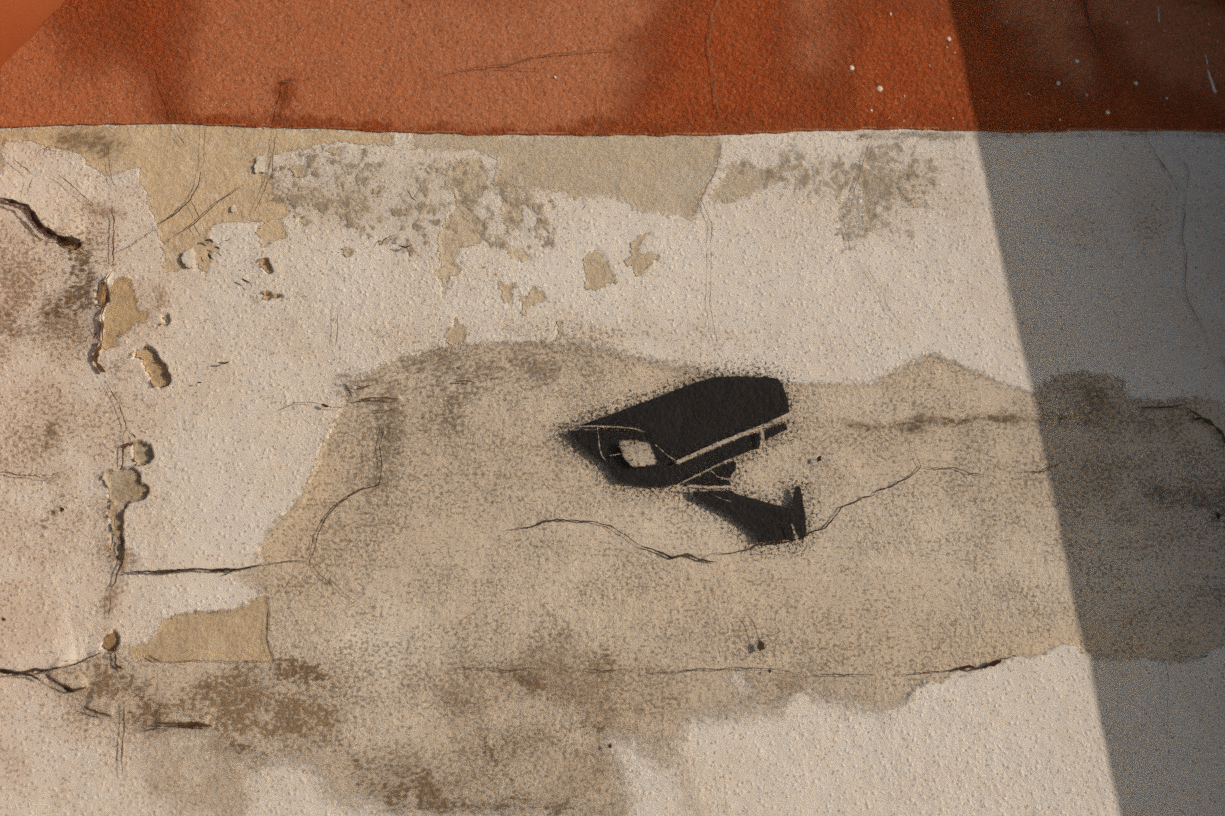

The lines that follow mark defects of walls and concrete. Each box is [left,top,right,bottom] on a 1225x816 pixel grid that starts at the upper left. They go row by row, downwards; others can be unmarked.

peeling [96,276,172,387]
crack [0,78,293,467]
peeling [0,124,938,297]
peeling [484,266,546,316]
crack [0,471,61,479]
crack [108,379,403,615]
peeling [49,317,1225,816]
crack [510,440,991,562]
crack [0,613,273,774]